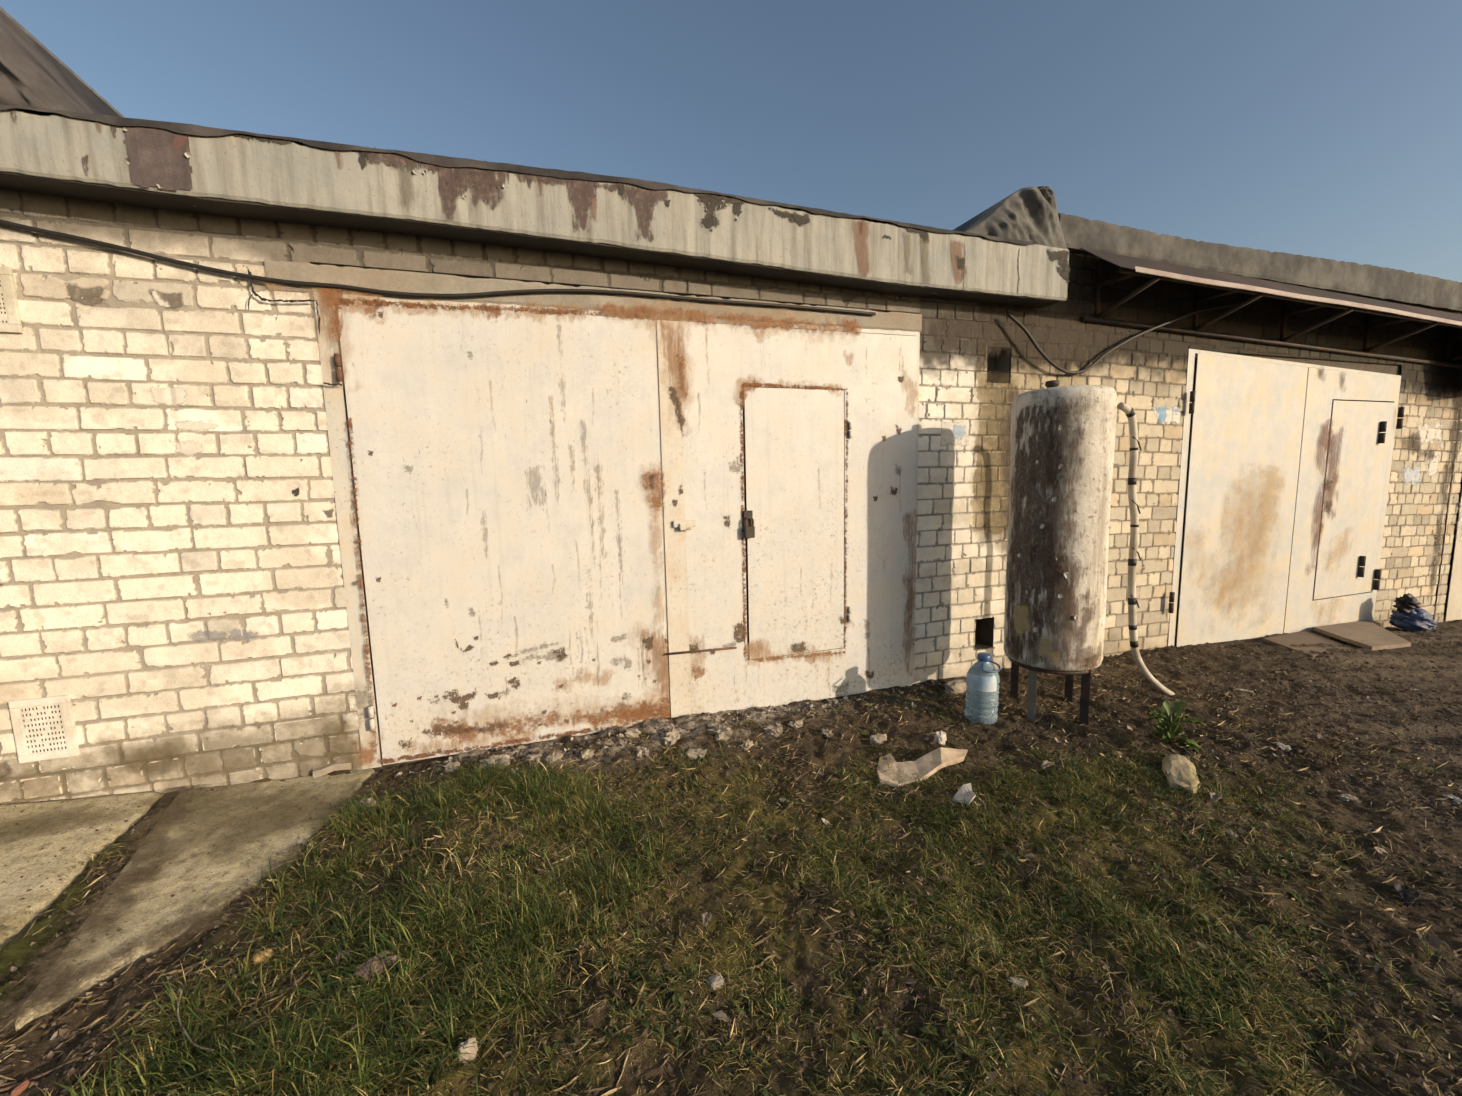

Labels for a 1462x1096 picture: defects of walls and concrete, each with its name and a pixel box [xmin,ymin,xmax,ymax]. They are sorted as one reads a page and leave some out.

rust [669,356,688,436]
rust [642,471,684,510]
rust [740,380,848,662]
rust [1313,421,1342,568]
rust [347,418,671,764]
peeling [417,636,578,730]
rust [689,643,715,679]